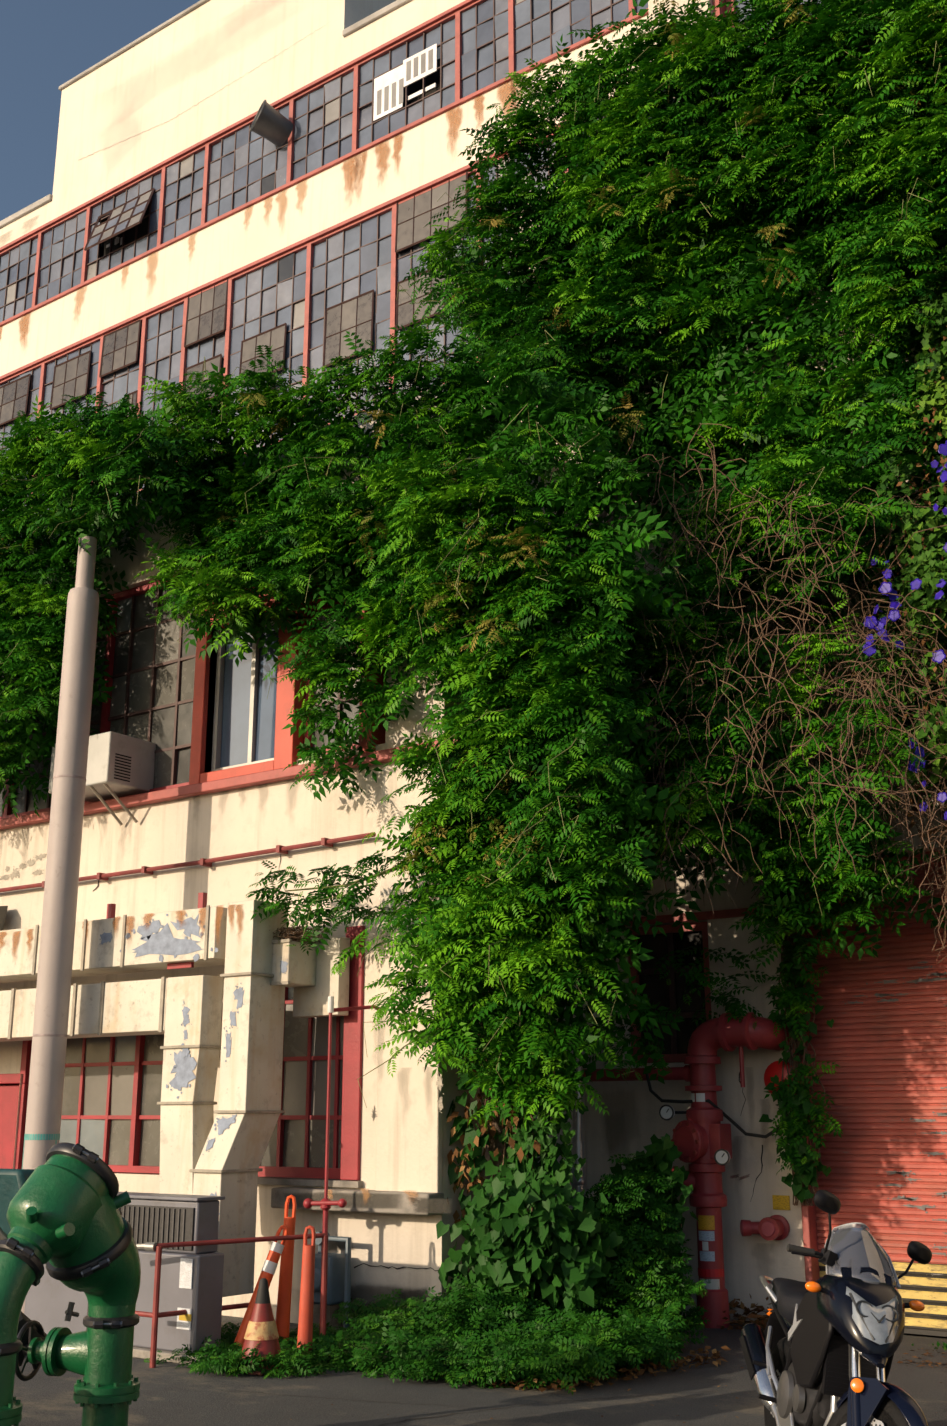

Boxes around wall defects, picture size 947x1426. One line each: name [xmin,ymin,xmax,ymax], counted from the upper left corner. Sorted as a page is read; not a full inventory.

corrosion [448,78,521,139]
corrosion [343,135,402,189]
corrosion [0,929,32,953]
corrosion [113,913,153,933]
peeling [100,914,218,962]
corrosion [178,904,243,931]
peeling [166,1001,197,1099]
peeling [202,1114,237,1155]